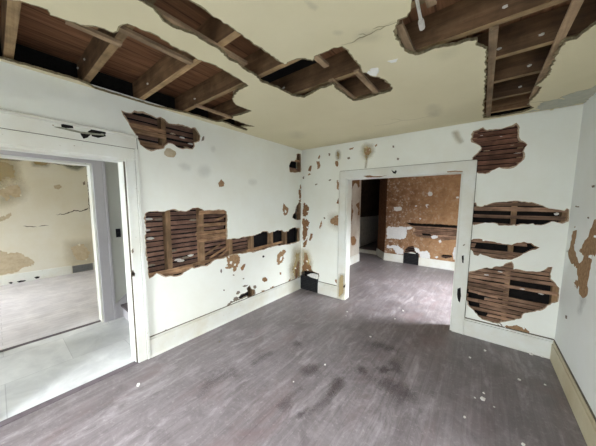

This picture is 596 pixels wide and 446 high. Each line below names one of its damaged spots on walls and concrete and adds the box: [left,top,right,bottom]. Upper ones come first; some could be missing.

peeling [528,85,596,112]
flaking render [121,110,204,151]
flaking render [471,123,527,174]
flaking render [144,153,320,281]
flaking render [405,222,457,241]
flaking render [472,201,569,226]
peeling [0,250,35,275]
peeling [567,217,596,298]
flaking render [466,239,559,336]